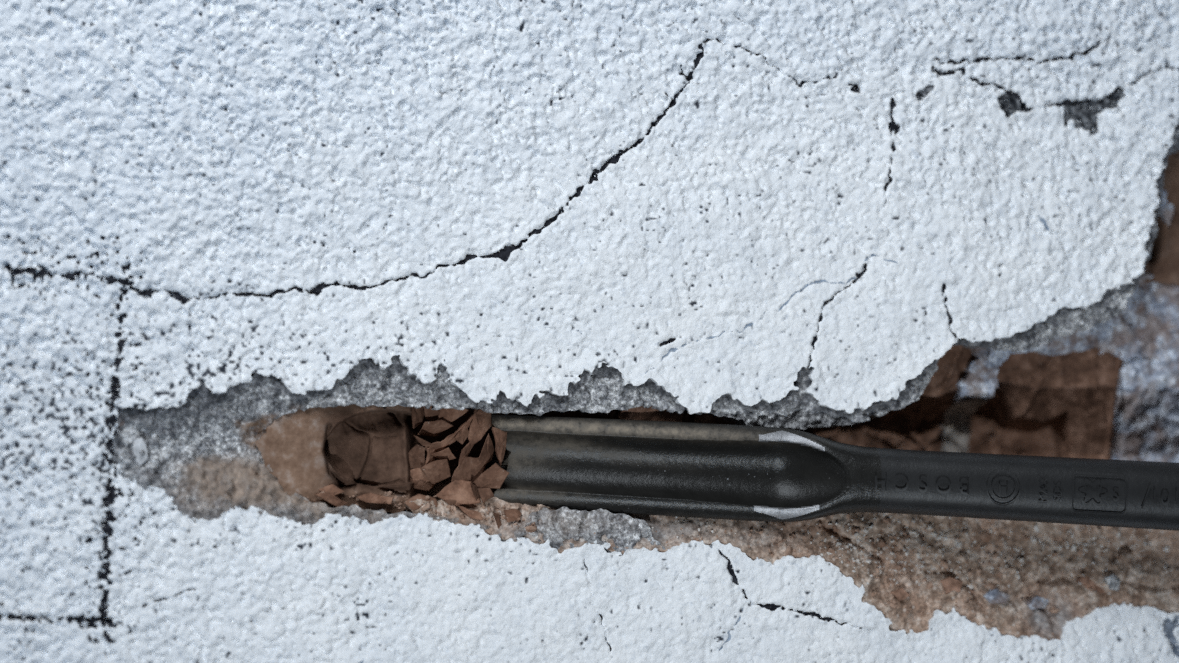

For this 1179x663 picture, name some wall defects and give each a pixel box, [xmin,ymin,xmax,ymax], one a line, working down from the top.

crack [884,39,1179,204]
crack [0,38,863,650]
spalling [112,123,1179,657]
crack [647,254,898,371]
crack [925,283,957,338]